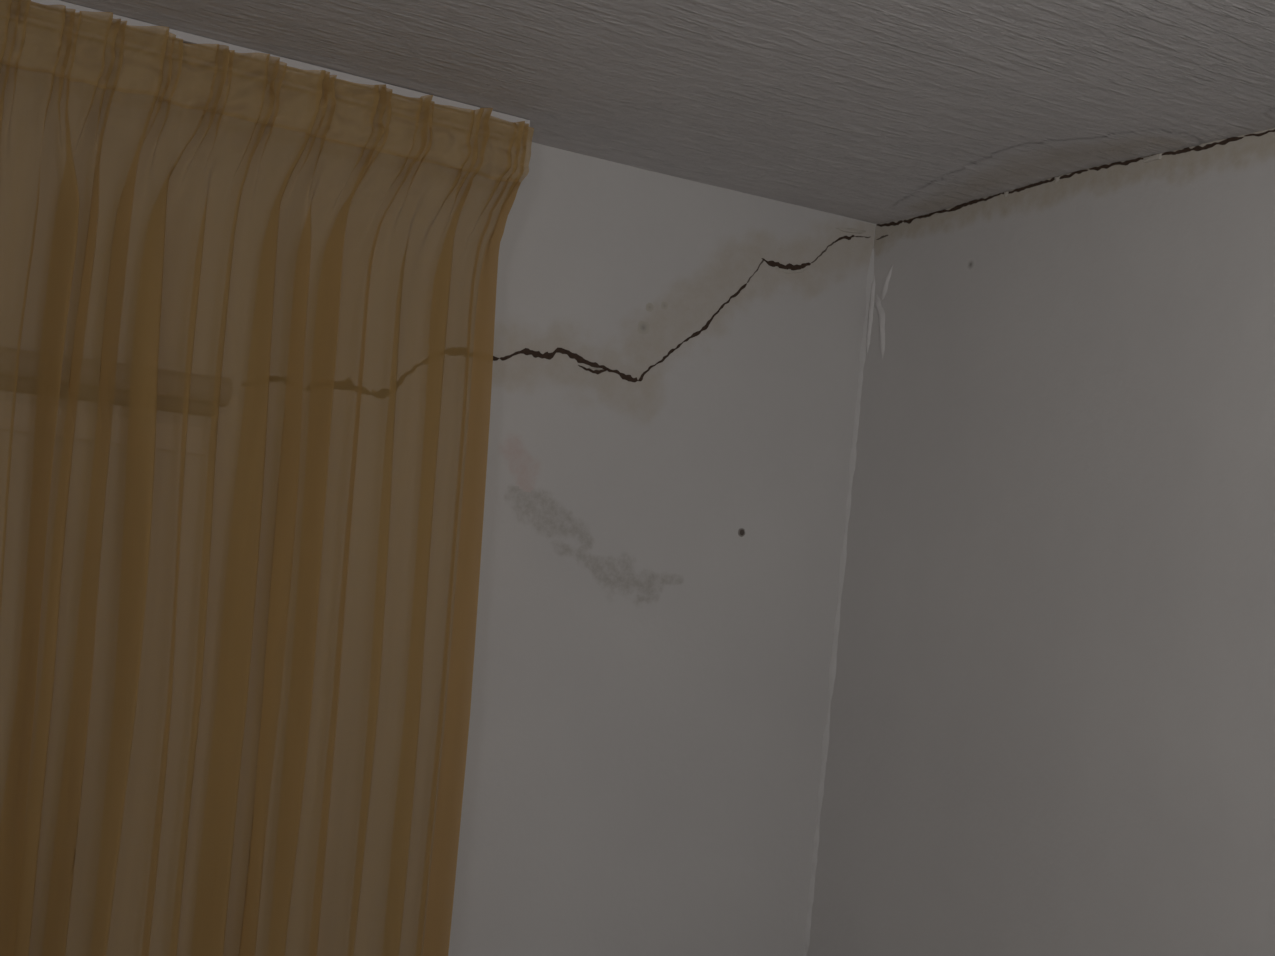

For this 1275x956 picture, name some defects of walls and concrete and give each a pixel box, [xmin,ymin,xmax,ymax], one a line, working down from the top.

crack [493,129,1275,382]